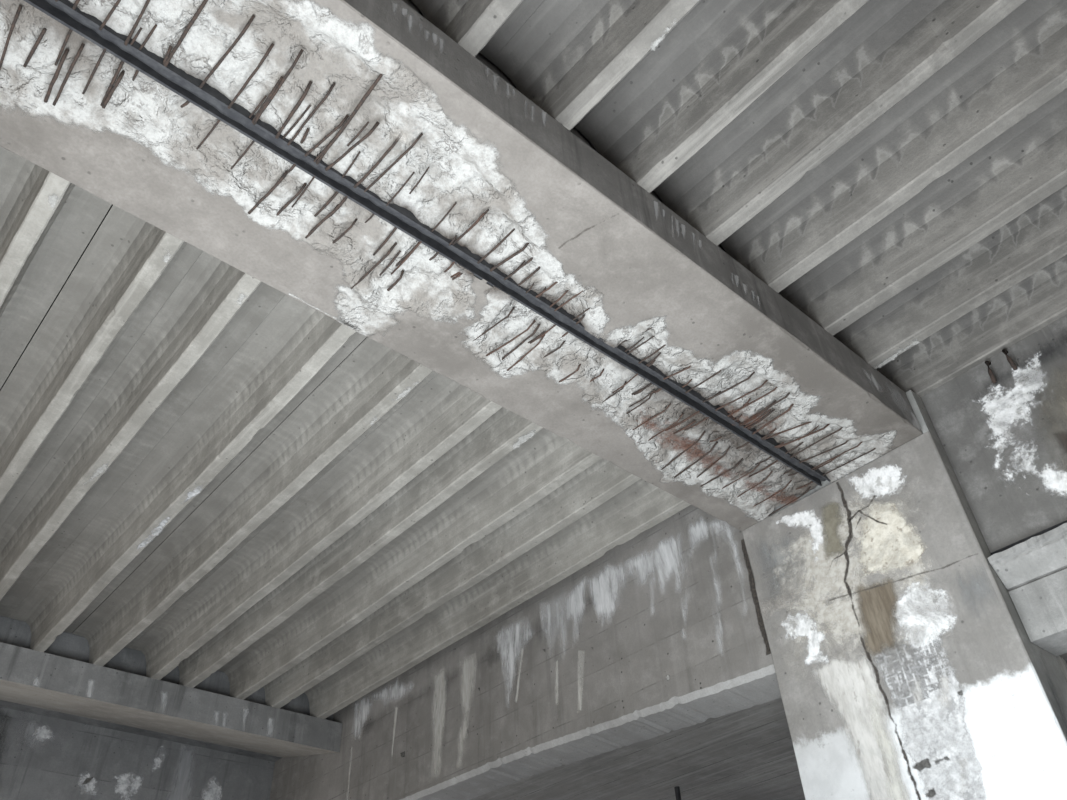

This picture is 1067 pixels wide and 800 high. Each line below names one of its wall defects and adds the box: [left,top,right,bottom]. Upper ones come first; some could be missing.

spalling [0,0,897,522]
spalling [876,341,920,368]
rust [642,418,730,477]
leakage [978,338,1067,495]
efflorescence [498,624,530,701]
efflorescence [542,540,681,630]
crack [741,539,771,655]
leakage [763,465,957,664]
crack [829,482,970,800]
efflorescence [355,682,412,754]
leakage [115,773,143,800]
leakage [168,748,222,800]